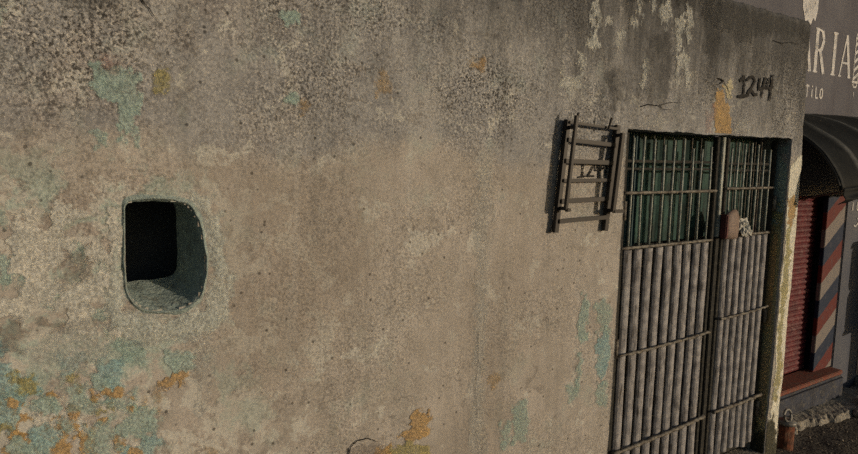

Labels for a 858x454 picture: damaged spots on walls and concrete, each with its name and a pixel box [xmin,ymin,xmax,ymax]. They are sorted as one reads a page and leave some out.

water stain [559,0,612,95]
water stain [616,0,693,86]
peeling [88,60,170,149]
peeling [0,199,178,454]
peeling [157,349,195,391]
water stain [750,203,784,454]
peeling [374,408,433,454]